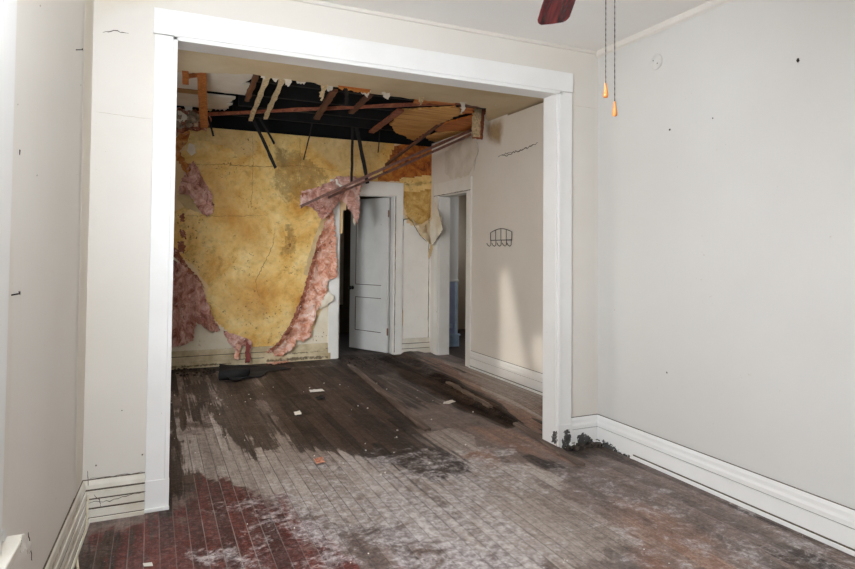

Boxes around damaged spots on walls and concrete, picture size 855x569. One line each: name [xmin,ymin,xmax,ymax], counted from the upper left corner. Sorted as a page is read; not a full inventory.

peeling [319,84,371,106]
peeling [444,136,478,179]
peeling [177,213,186,253]
peeling [400,175,432,339]
peeling [172,322,245,360]
peeling [273,305,328,356]